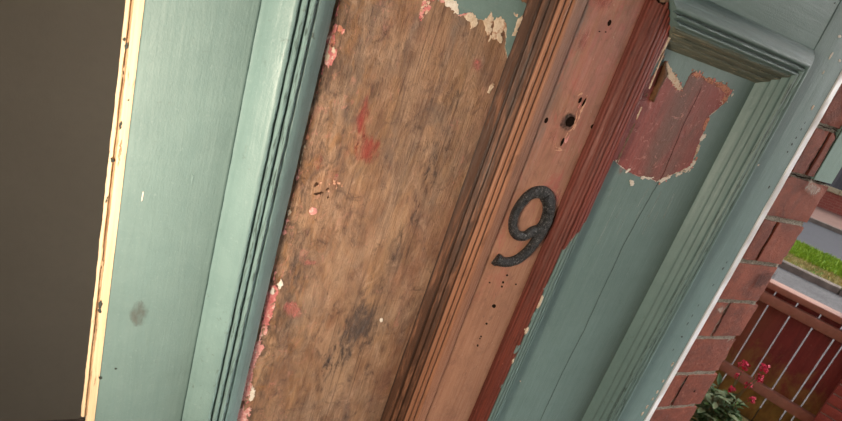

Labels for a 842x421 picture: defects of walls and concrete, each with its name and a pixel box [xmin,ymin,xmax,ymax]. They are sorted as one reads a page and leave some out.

peeling [316,0,345,94]
peeling [419,0,526,58]
peeling [613,42,734,186]
peeling [237,271,283,421]